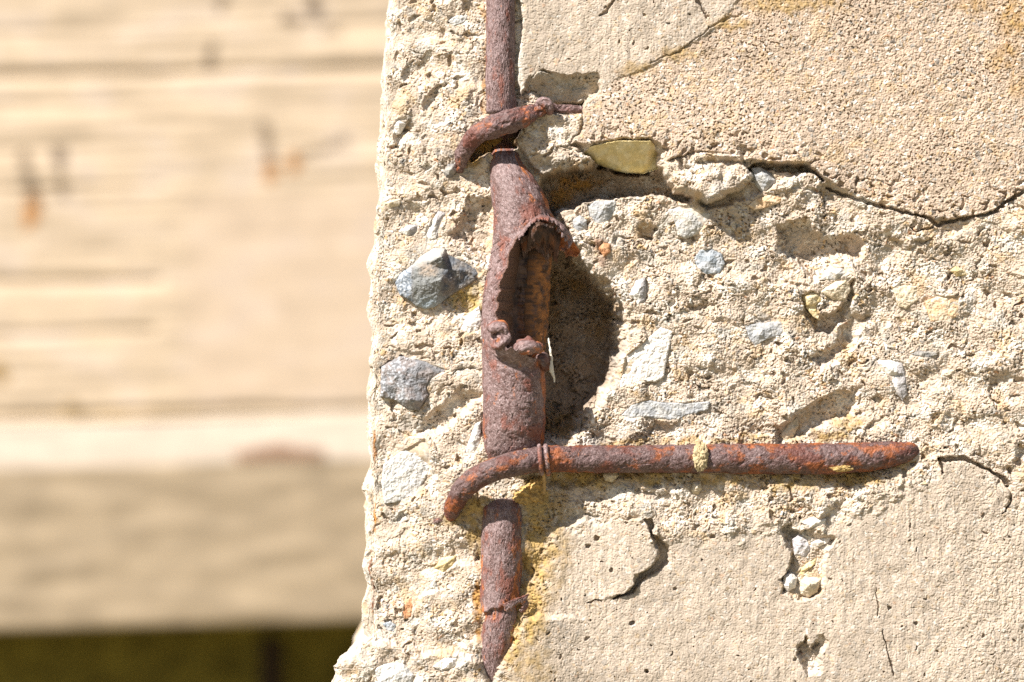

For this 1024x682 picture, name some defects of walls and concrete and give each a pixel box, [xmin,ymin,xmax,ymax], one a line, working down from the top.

corrosion [467,138,501,166]
crack [746,161,1024,233]
corrosion [452,215,581,362]
spalling [348,0,1024,682]
corrosion [771,474,809,489]
corrosion [824,472,880,486]
crack [937,454,1016,515]
corrosion [503,472,607,663]
crack [586,517,673,605]
corrosion [472,581,482,639]